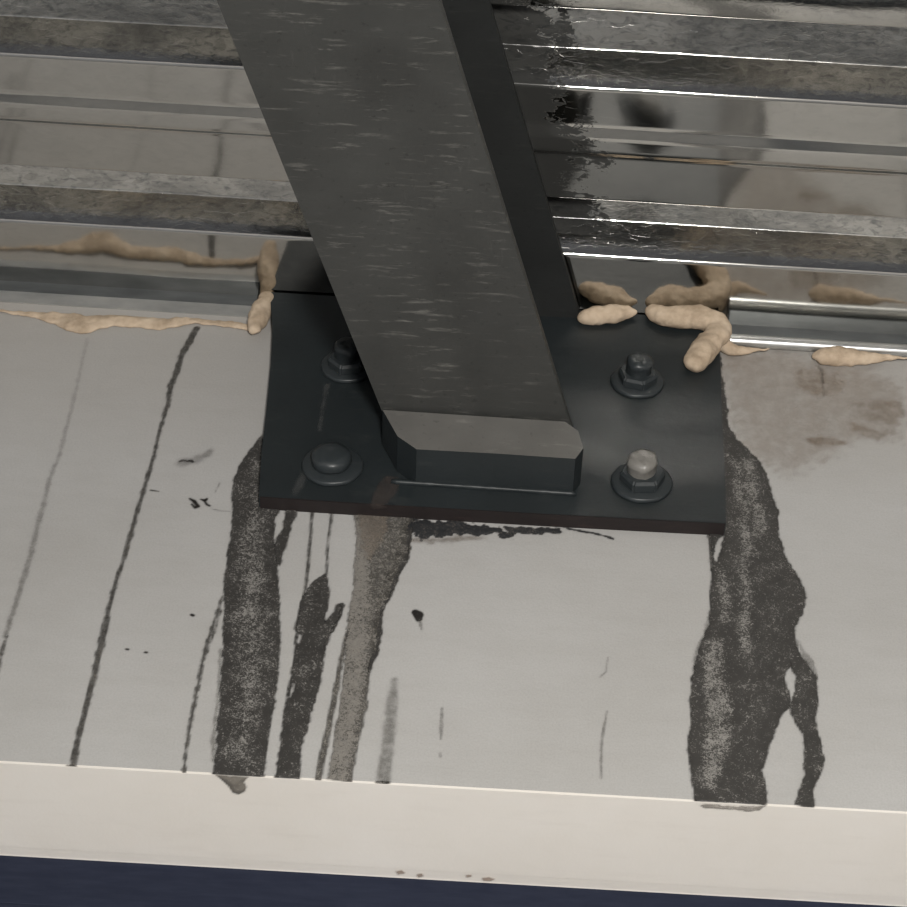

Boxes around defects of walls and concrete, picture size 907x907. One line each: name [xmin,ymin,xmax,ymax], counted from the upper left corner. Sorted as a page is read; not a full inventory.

water stain [212,436,330,779]
water stain [328,515,415,782]
water stain [687,357,807,805]